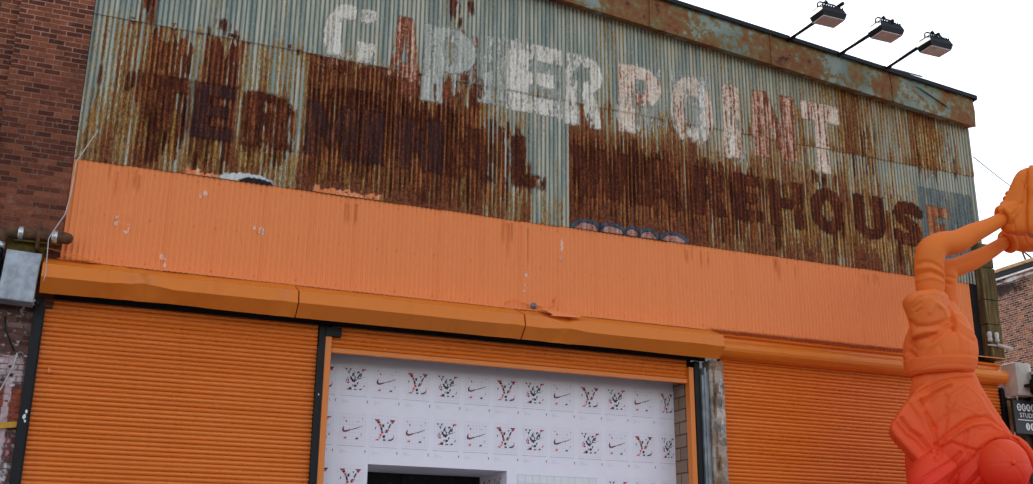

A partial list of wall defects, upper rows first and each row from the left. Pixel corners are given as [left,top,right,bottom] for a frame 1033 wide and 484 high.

rust [85,0,532,210]
rust [570,105,923,270]
rust [914,123,957,187]